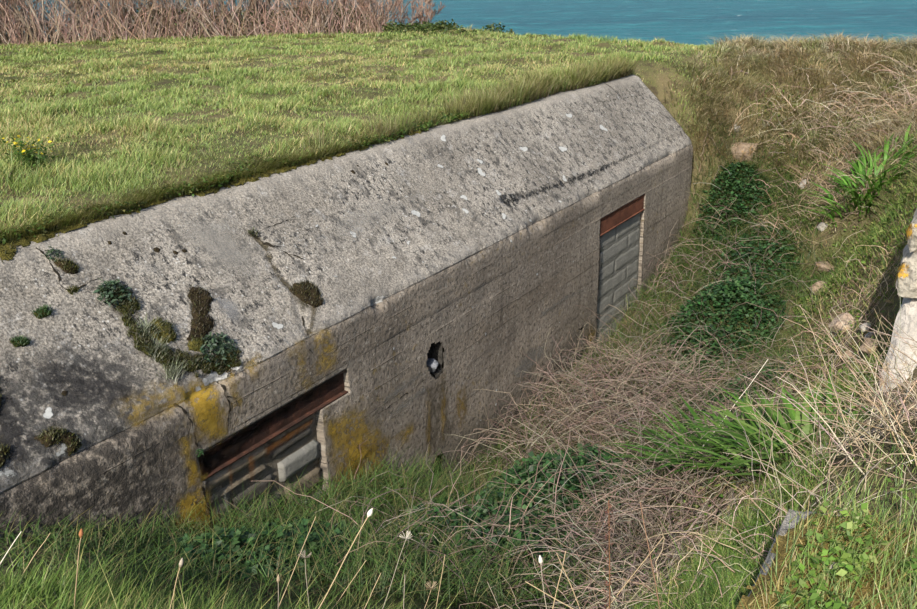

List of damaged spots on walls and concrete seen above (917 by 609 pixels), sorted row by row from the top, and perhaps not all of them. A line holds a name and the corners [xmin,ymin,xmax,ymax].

crack [252,211,305,260]
spalling [427,341,443,380]
crack [215,381,238,423]
crack [173,403,198,447]
crack [202,486,214,531]